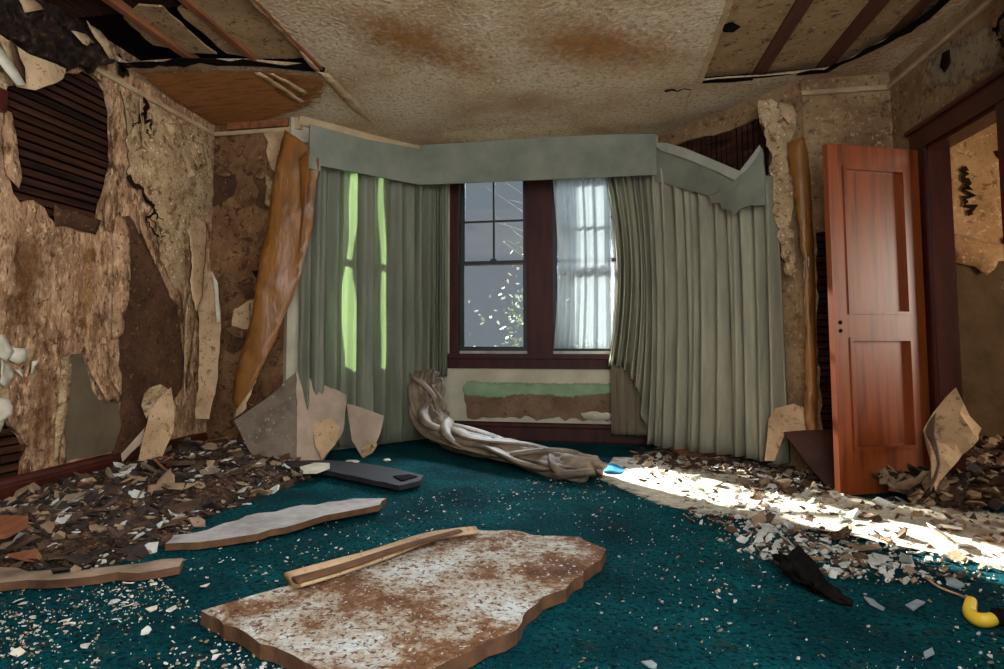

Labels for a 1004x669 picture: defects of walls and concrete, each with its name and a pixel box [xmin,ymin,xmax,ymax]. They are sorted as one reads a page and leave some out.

peeling [126,64,377,126]
spalling [925,25,1003,87]
flaking render [2,111,22,189]
flaking render [54,180,119,235]
crack [127,174,164,237]
flaking render [757,99,797,278]
peeling [212,272,220,323]
flaking render [954,234,1004,440]
peeling [0,333,39,432]
flaking render [53,343,122,461]